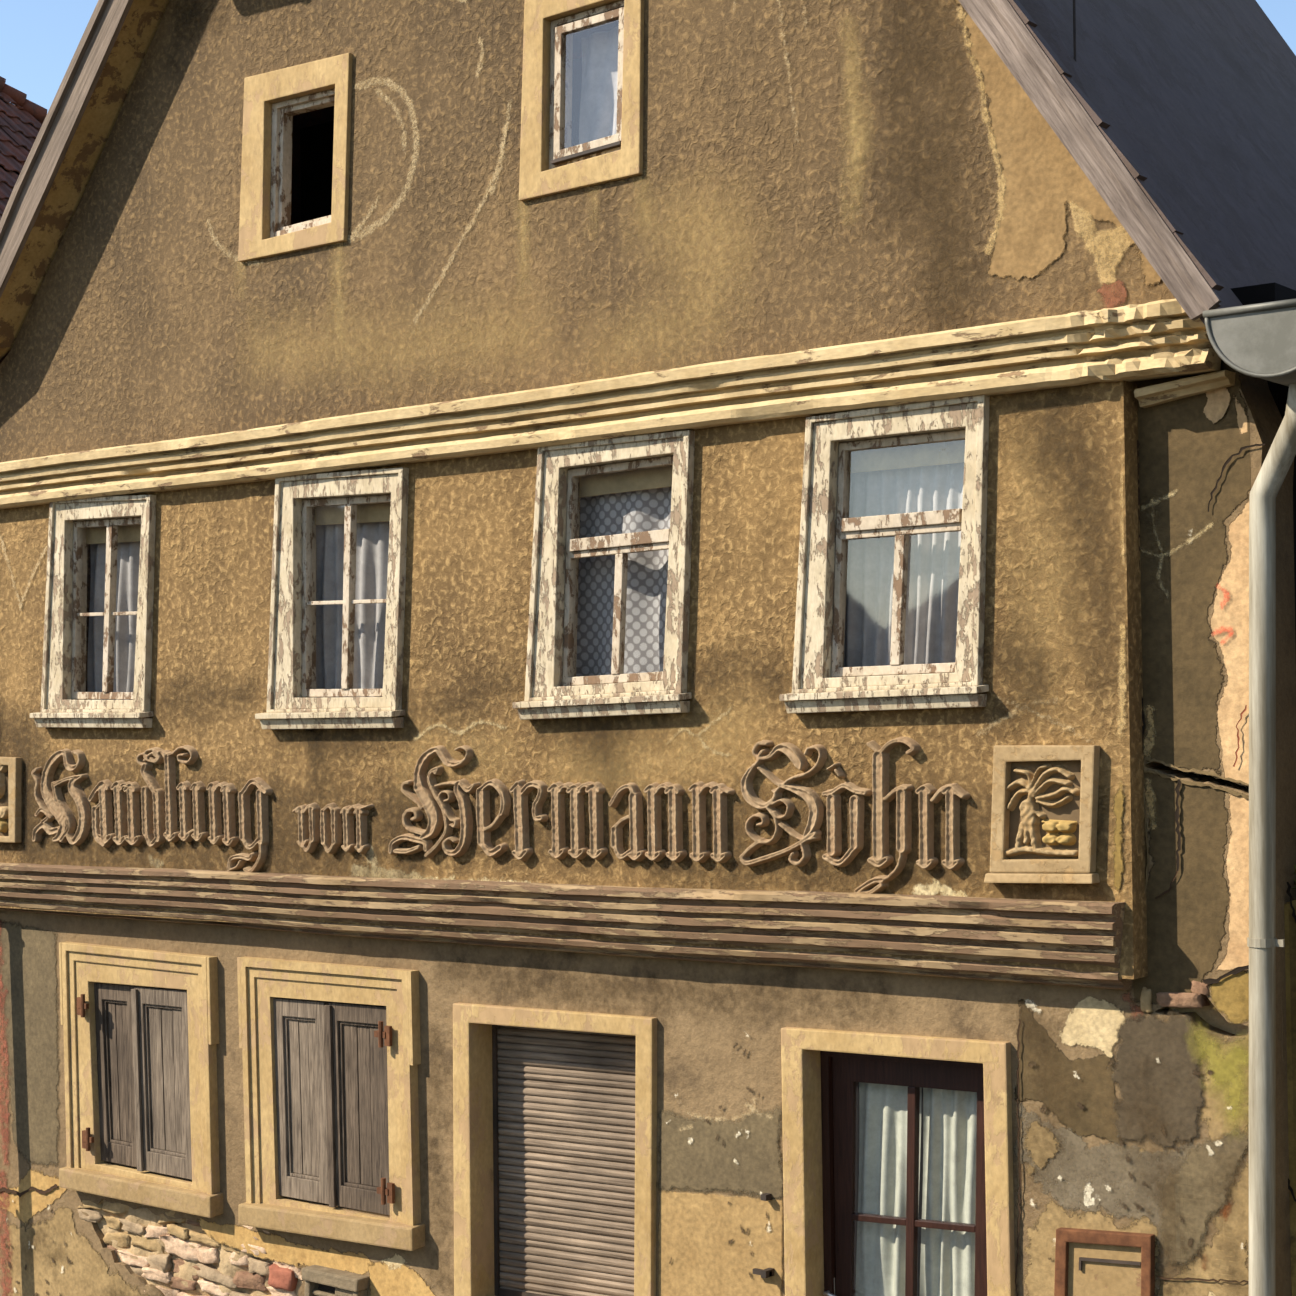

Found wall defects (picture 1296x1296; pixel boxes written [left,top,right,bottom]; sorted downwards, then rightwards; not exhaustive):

peeling [955,0,1161,308]
crack [1137,440,1265,596]
peeling [1014,361,1251,1186]
crack [1141,675,1249,899]
water stain [1197,1030,1249,1119]
spalling [77,1200,436,1296]
peeling [1023,1161,1249,1296]